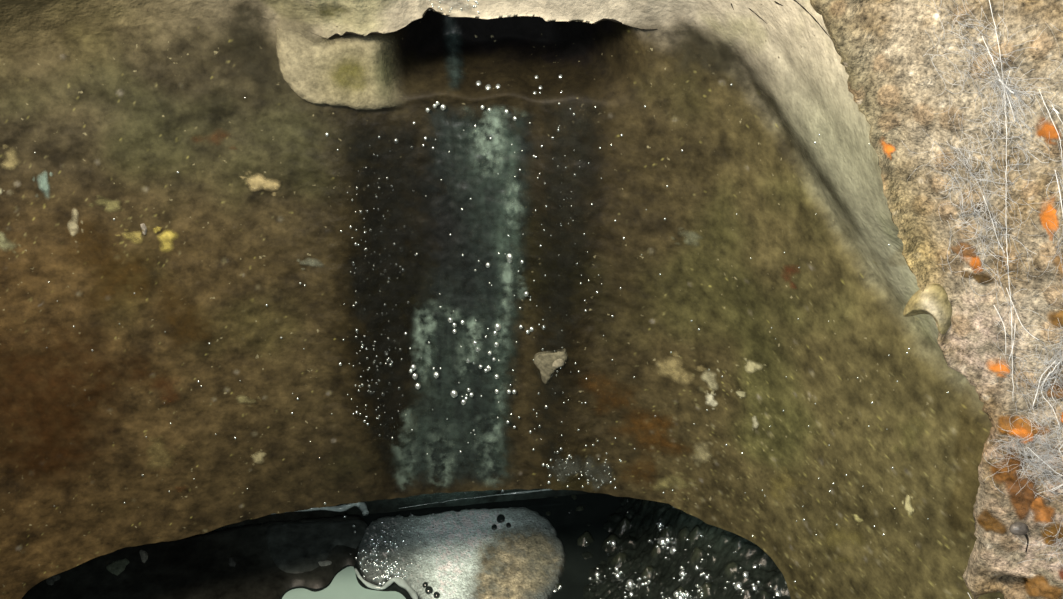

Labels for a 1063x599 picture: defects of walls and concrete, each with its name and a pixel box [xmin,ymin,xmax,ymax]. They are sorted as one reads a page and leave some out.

damp [347,130,428,460]